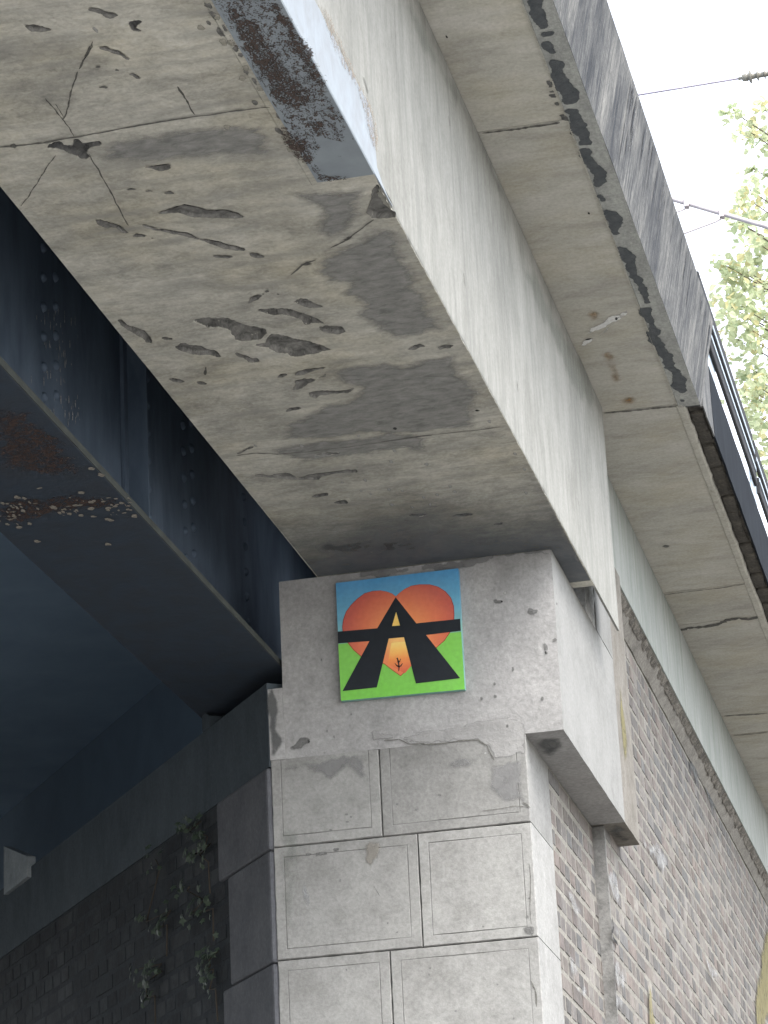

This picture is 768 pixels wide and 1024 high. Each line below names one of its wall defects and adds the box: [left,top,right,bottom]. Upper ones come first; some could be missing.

corrosion [215,0,353,182]
corrosion [318,5,378,150]
crack [0,42,270,226]
spalling [159,191,243,218]
spalling [366,185,396,218]
spalling [96,220,264,258]
spalling [118,319,221,357]
spalling [195,290,345,363]
crack [680,617,758,631]
water stain [267,690,282,754]
water stain [311,757,362,777]
crack [384,739,494,760]